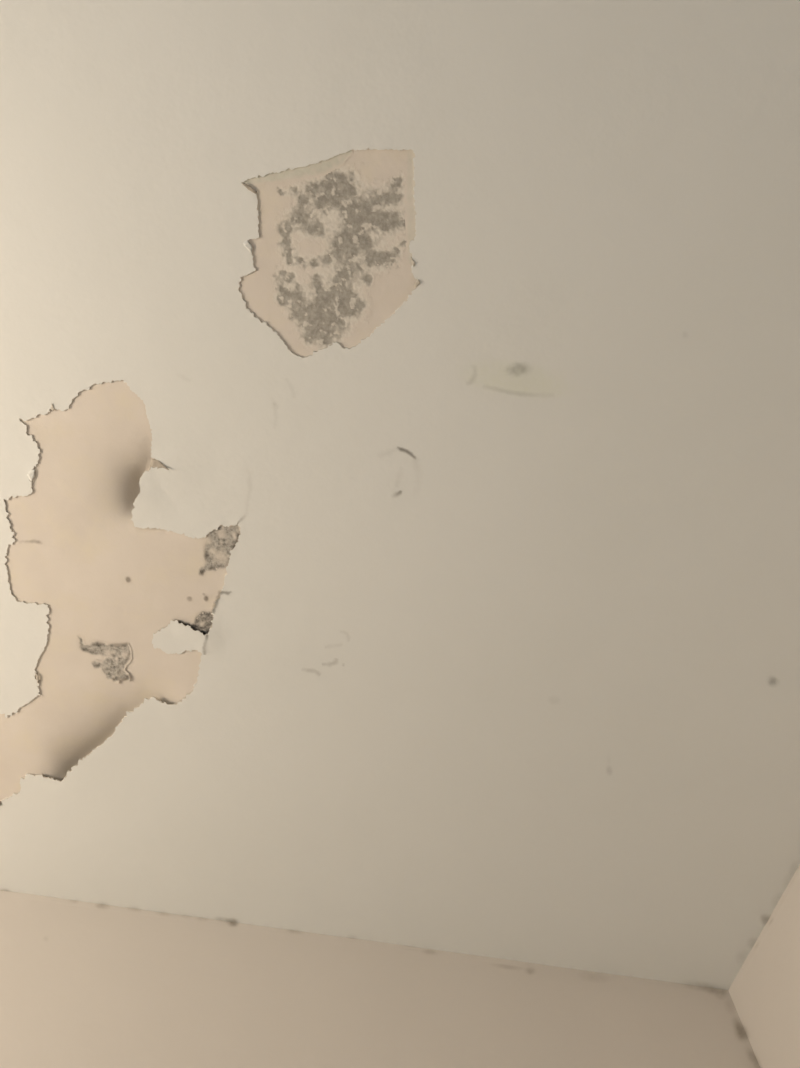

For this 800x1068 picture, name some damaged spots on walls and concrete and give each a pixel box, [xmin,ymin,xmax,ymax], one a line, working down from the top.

peeling [239,148,420,357]
peeling [0,380,241,807]